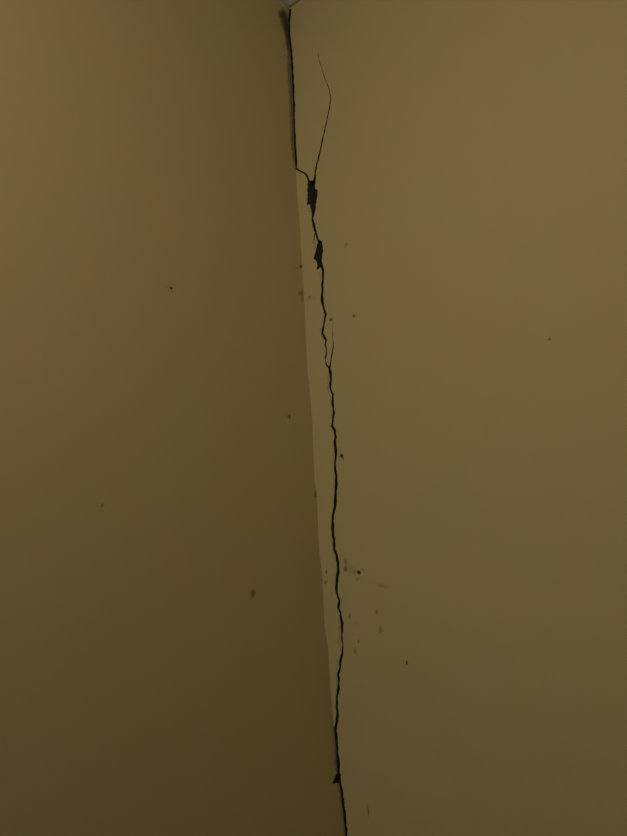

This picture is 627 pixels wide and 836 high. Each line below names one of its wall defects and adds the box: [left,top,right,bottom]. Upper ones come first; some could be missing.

crack [287,9,331,184]
crack [310,209,322,247]
crack [321,267,348,836]